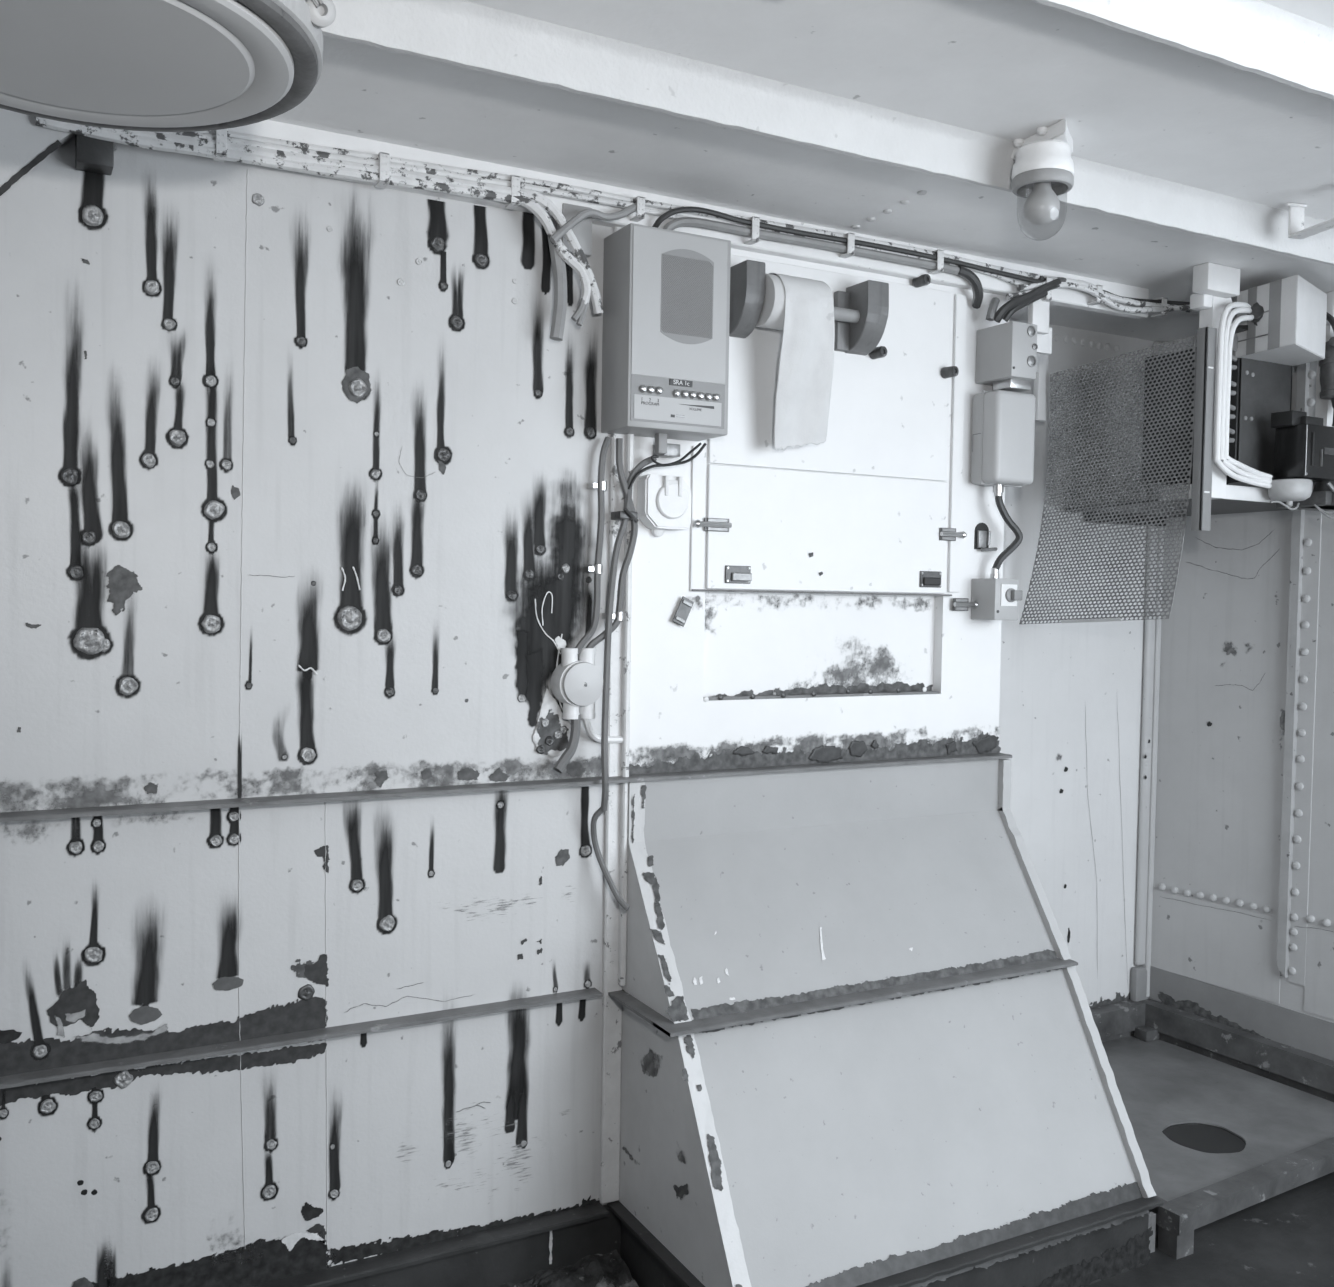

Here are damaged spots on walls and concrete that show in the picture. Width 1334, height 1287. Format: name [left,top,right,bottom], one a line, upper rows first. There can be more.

corrosion [106,565,143,615]
peeling [631,785,647,843]
corrosion [314,845,330,873]
corrosion [555,849,570,866]
peeling [643,855,1062,1091]
peeling [47,953,168,1044]
corrosion [1089,992,1130,1008]
corrosion [1158,992,1270,1040]
peeling [707,1134,723,1191]
peeling [282,1202,327,1251]
peeling [806,1182,1153,1287]